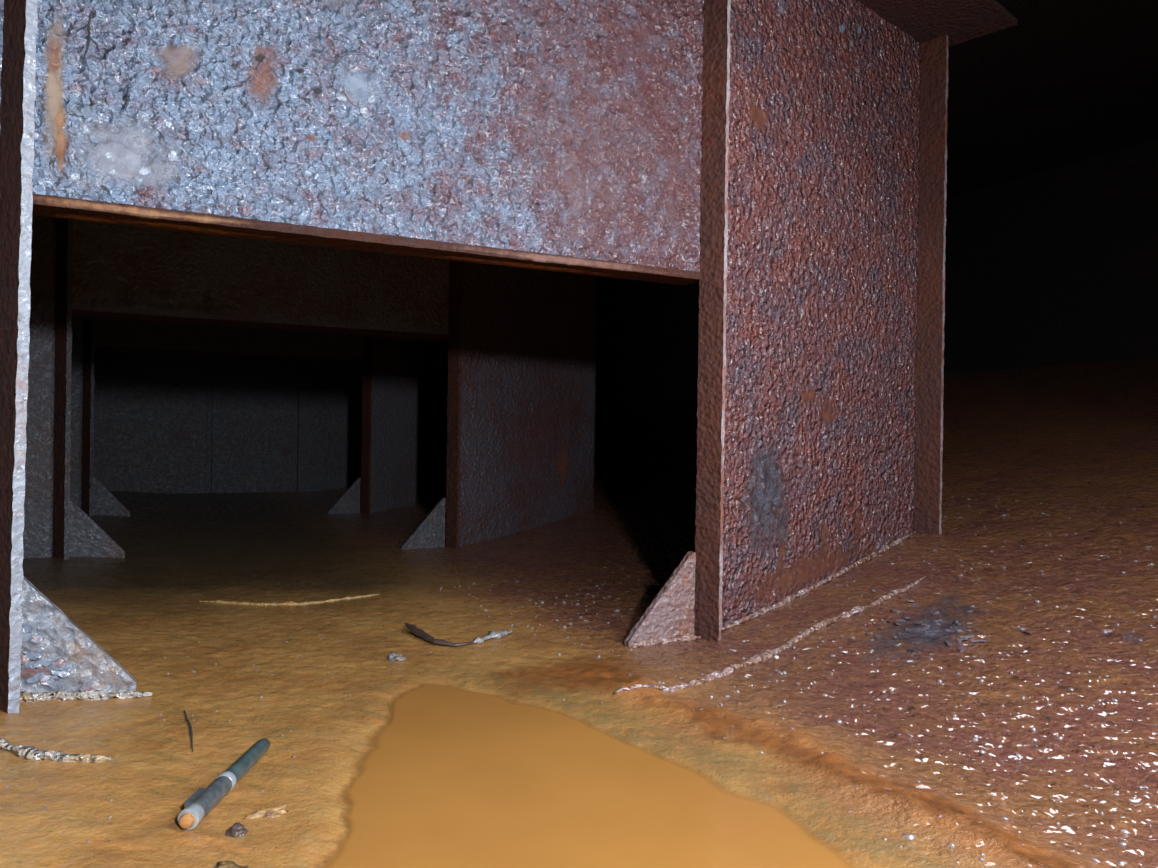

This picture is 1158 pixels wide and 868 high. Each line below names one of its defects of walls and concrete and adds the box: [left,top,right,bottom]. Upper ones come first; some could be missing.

rust [47,40,67,168]
rust [49,199,250,235]
rust [445,252,630,274]